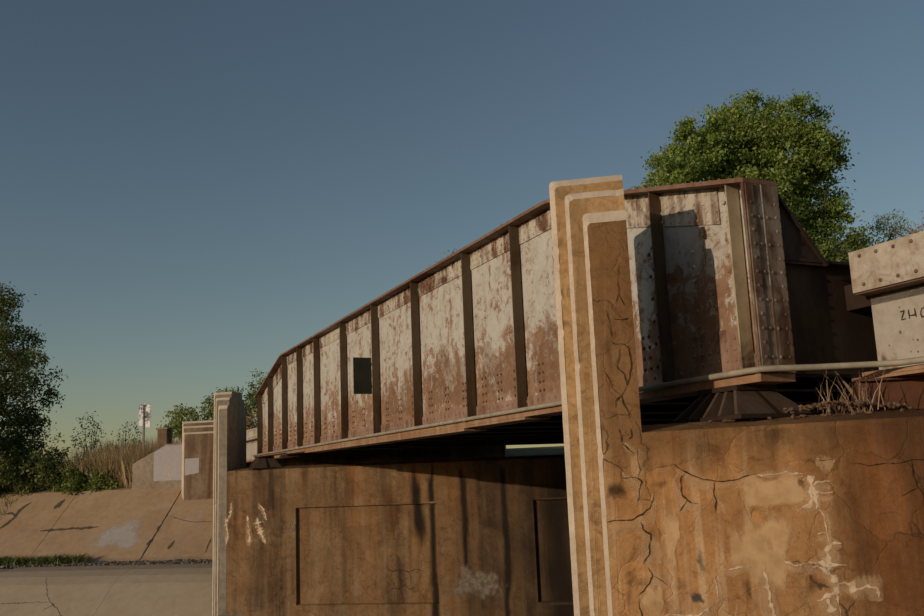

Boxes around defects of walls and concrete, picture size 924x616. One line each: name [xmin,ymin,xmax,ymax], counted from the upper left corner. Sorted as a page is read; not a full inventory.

crack [603,265,668,616]
crack [2,579,62,616]
water stain [246,504,267,545]
water stain [412,467,439,616]
water stain [460,471,468,566]
peeling [452,567,498,598]
water stain [501,469,511,616]
crack [675,465,752,512]